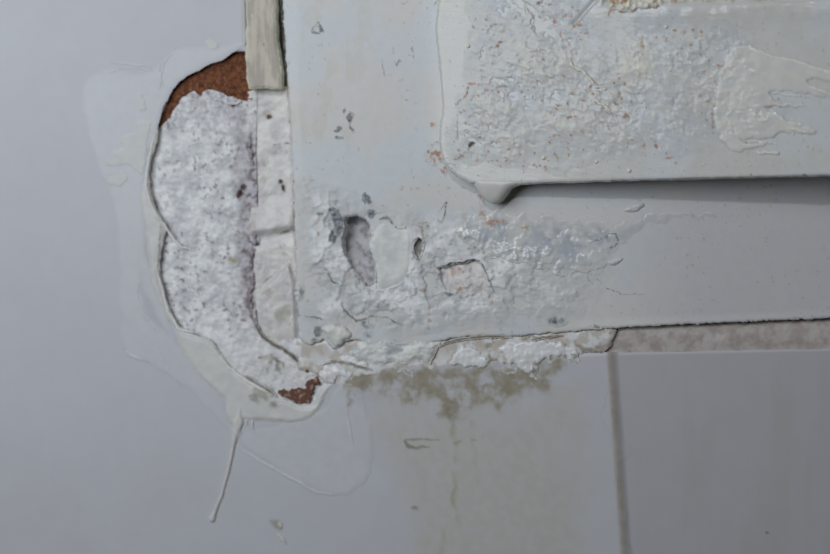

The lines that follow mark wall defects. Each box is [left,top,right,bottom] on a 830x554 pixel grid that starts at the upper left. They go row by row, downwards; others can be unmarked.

peeling [333,107,355,140]
rust [423,141,447,176]
spalling [140,52,334,426]
peeling [316,206,345,243]
peeling [361,191,412,289]
crack [431,259,494,293]
crack [617,318,830,330]
water stain [341,353,632,554]